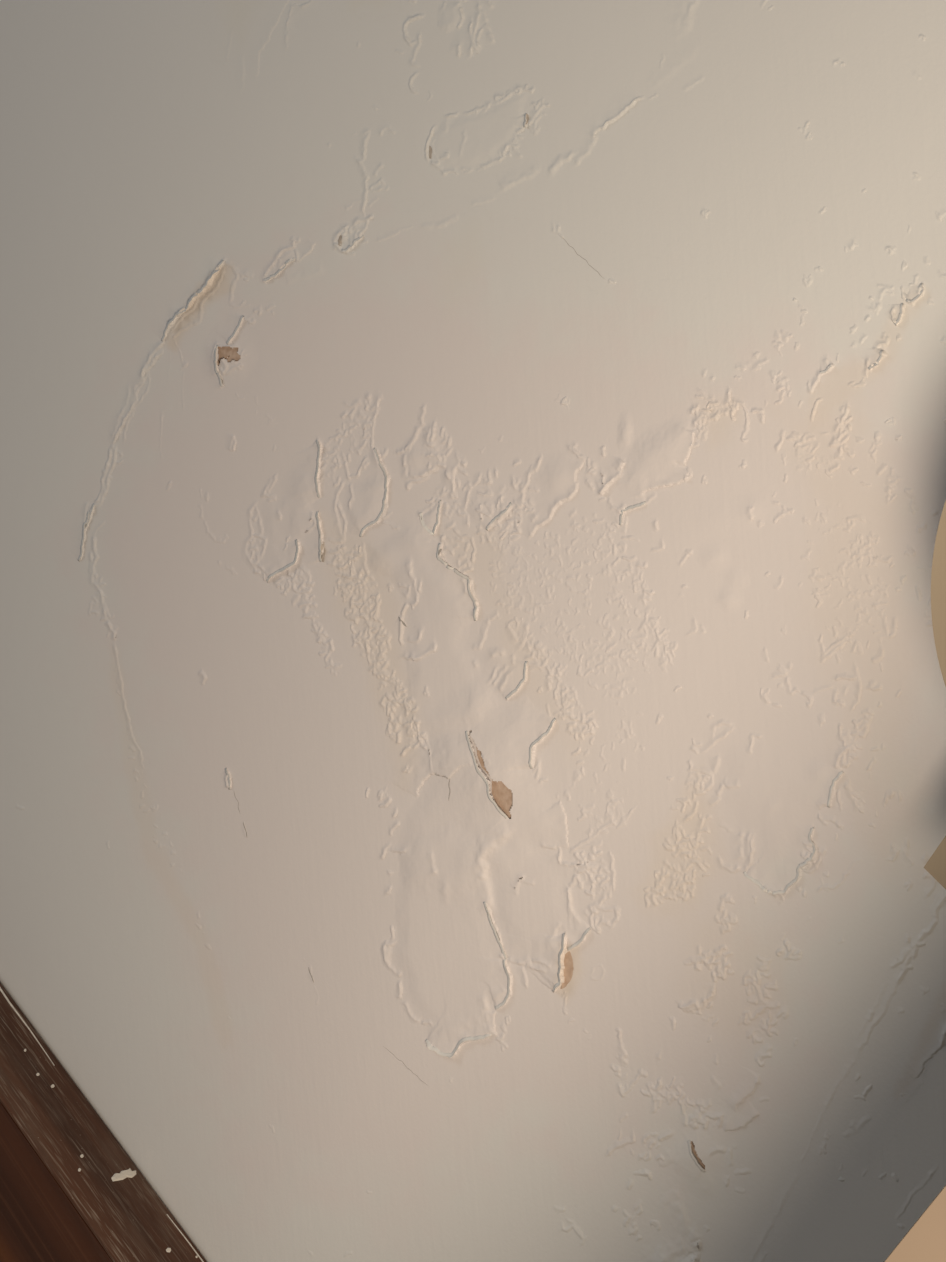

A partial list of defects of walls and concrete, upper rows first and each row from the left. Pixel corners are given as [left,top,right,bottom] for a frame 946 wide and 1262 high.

flaking render [214,315,245,387]
peeling [806,259,925,460]
peeling [197,472,326,583]
peeling [326,539,593,1058]